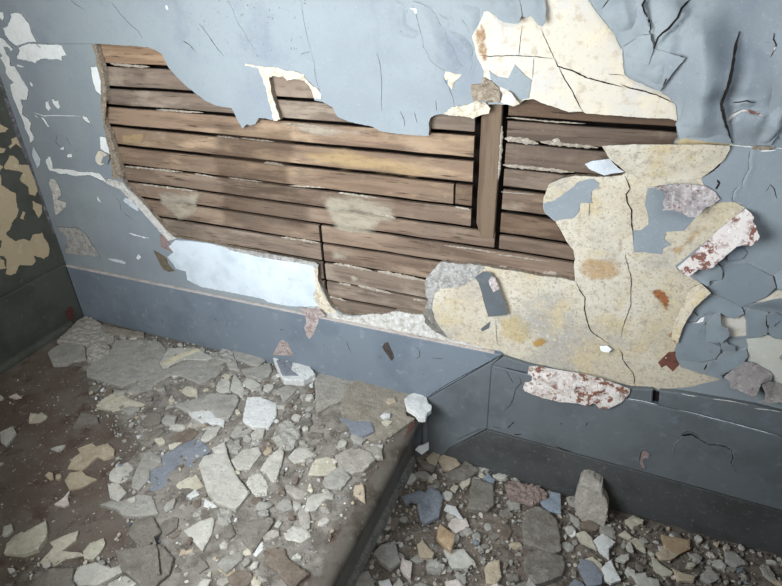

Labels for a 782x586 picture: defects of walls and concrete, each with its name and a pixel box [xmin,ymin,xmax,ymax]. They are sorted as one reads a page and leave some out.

crack [412,4,459,110]
crack [462,19,673,110]
crack [641,0,690,48]
crack [705,31,755,208]
flaking render [0,0,782,389]
crack [577,177,636,386]
crack [671,431,740,473]